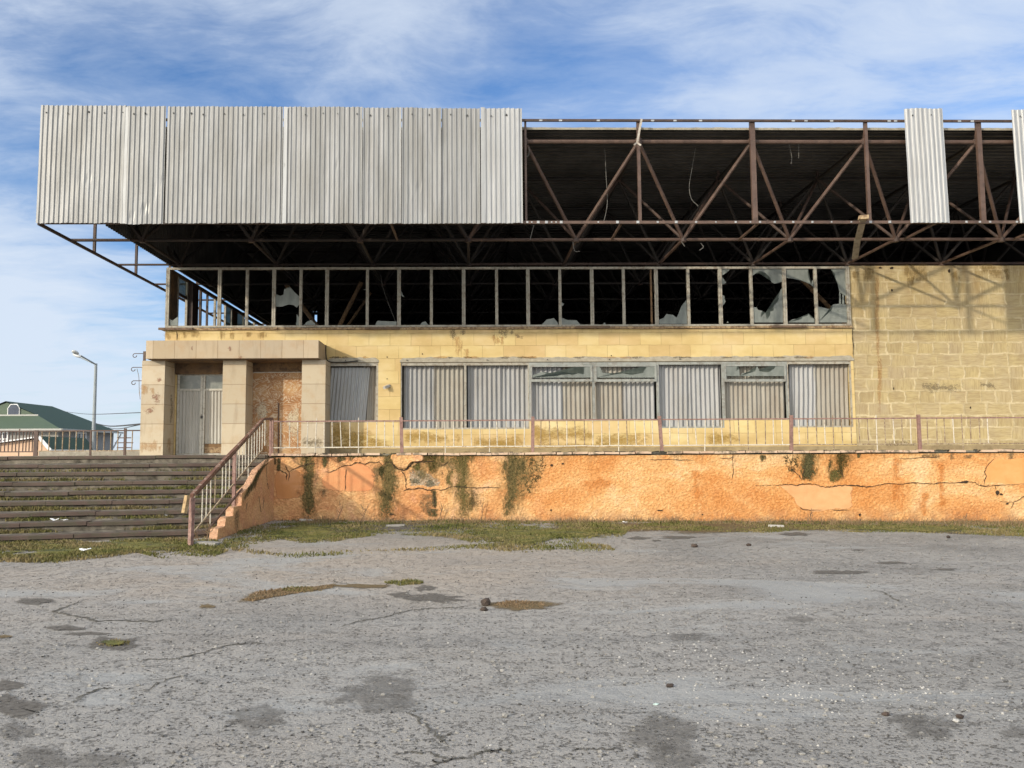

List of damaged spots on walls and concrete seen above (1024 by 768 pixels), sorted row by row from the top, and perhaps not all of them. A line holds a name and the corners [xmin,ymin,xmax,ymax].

crack [246,455,499,509]
water stain [440,456,477,507]
crack [721,456,1024,511]